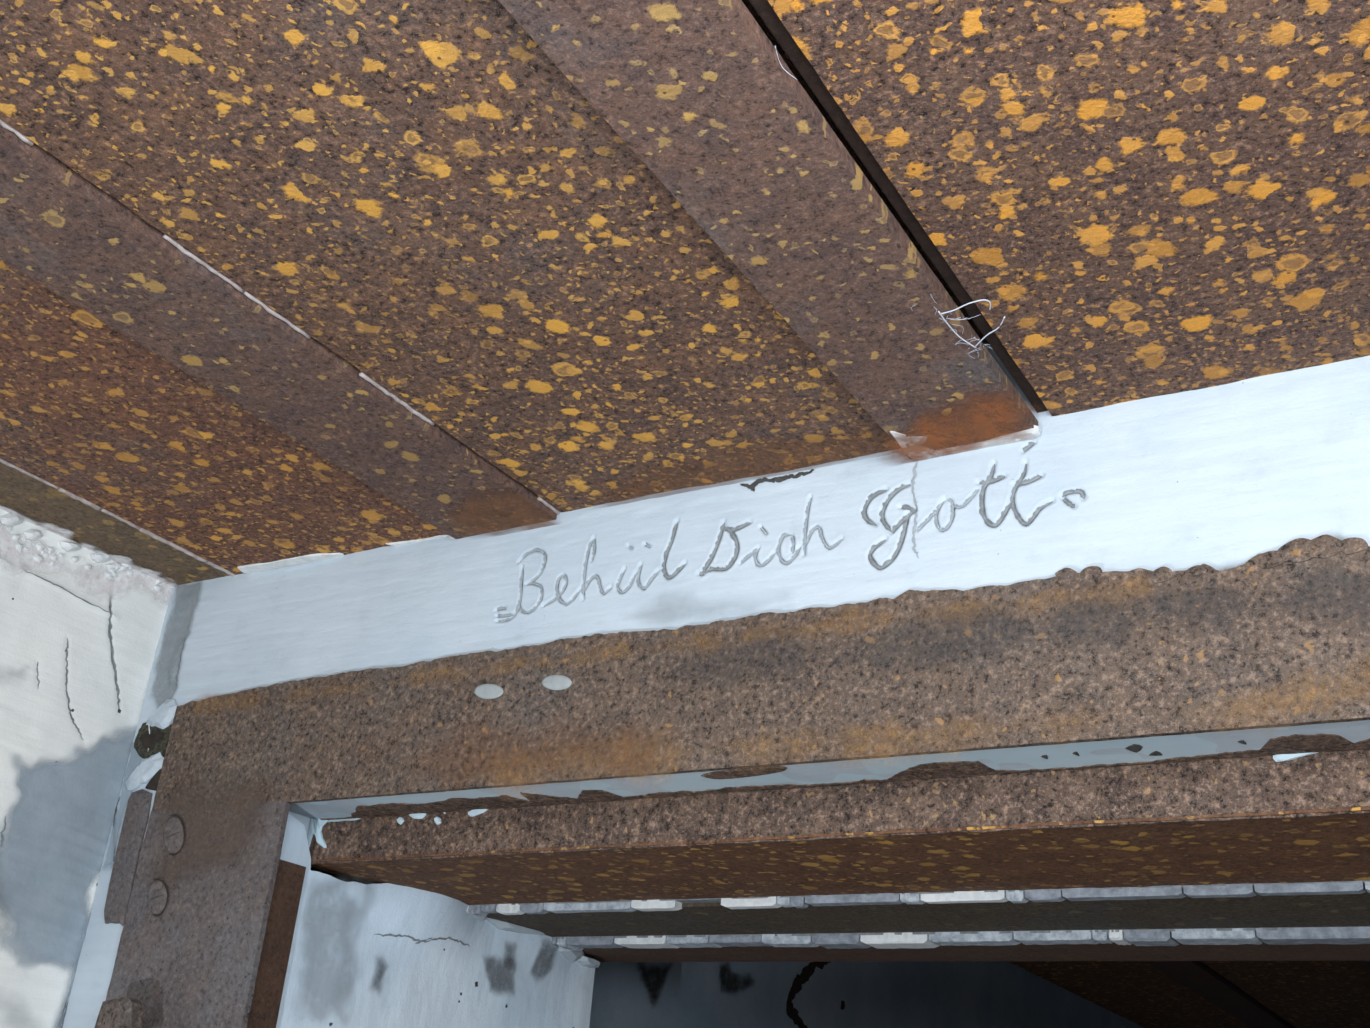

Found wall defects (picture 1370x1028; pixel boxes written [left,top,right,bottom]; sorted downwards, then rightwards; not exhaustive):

corrosion [893,398,1022,462]
corrosion [451,495,554,534]
flaking render [386,535,454,546]
flaking render [237,553,344,574]
flaking render [1125,744,1162,756]
peeling [1273,752,1319,762]
crack [0,816,8,847]
damp [0,731,142,992]